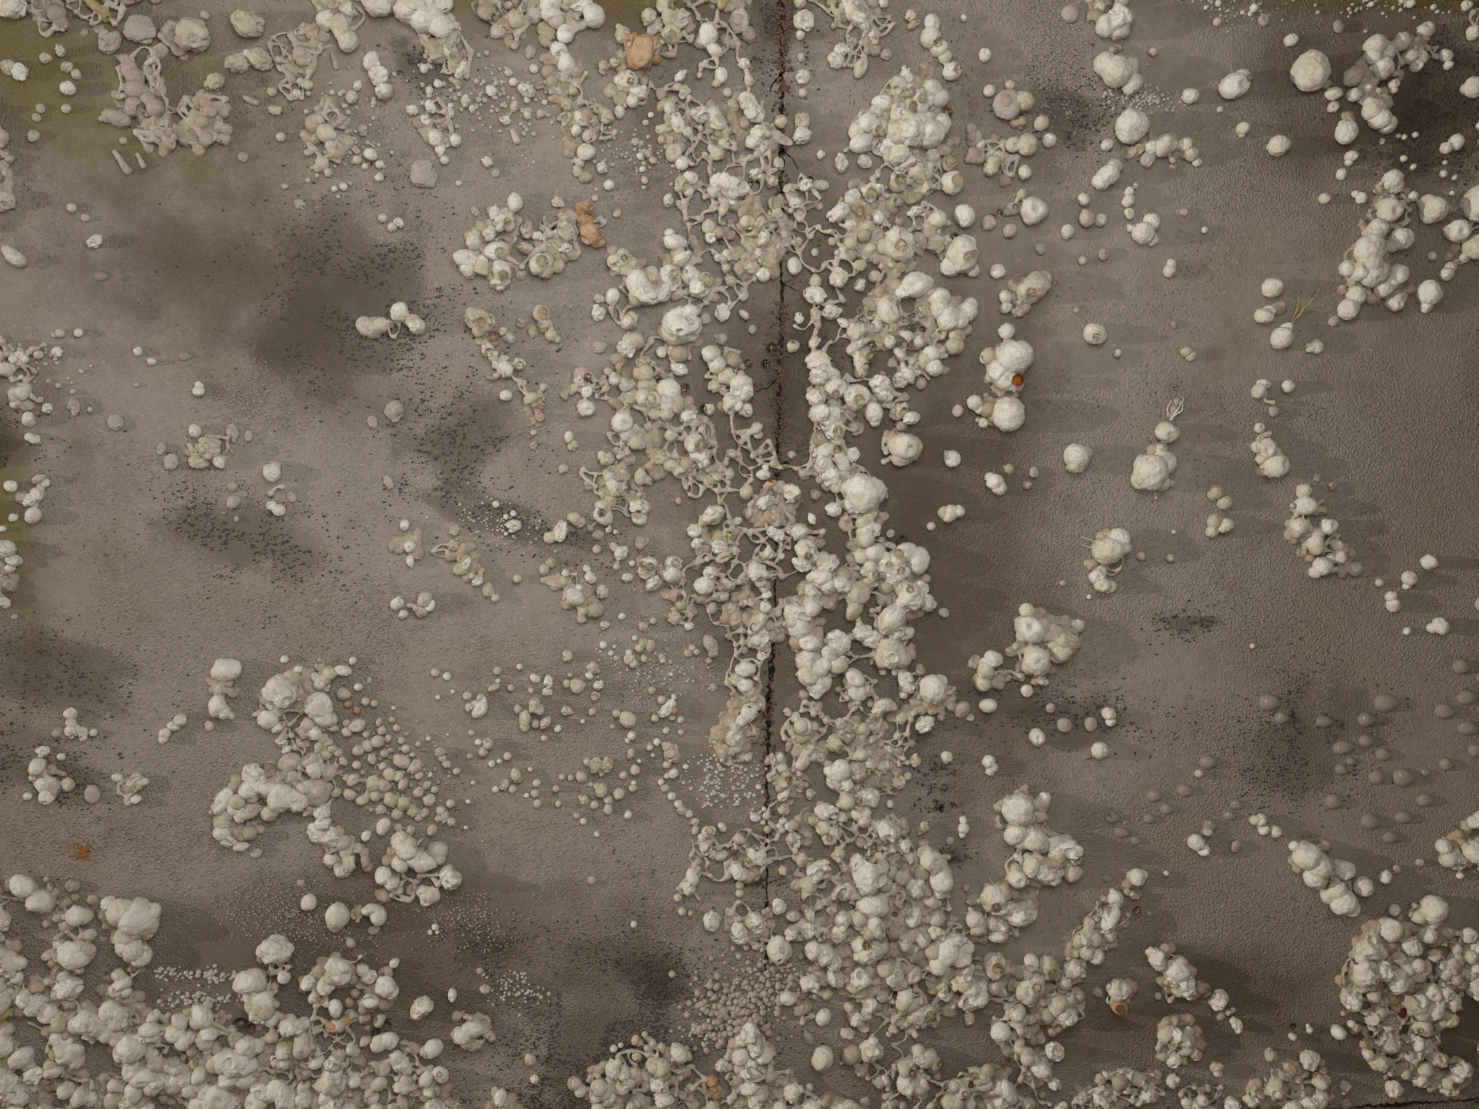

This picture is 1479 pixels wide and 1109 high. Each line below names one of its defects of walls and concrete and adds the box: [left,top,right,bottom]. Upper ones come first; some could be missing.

damp [0,0,260,212]
damp [1,244,28,268]
damp [1337,189,1422,320]
damp [0,338,47,383]
damp [192,381,205,396]
damp [260,95,567,584]
crack [756,0,799,972]
damp [0,395,456,903]
damp [465,693,488,719]
damp [1073,955,1244,1109]
crack [1357,1097,1479,1108]